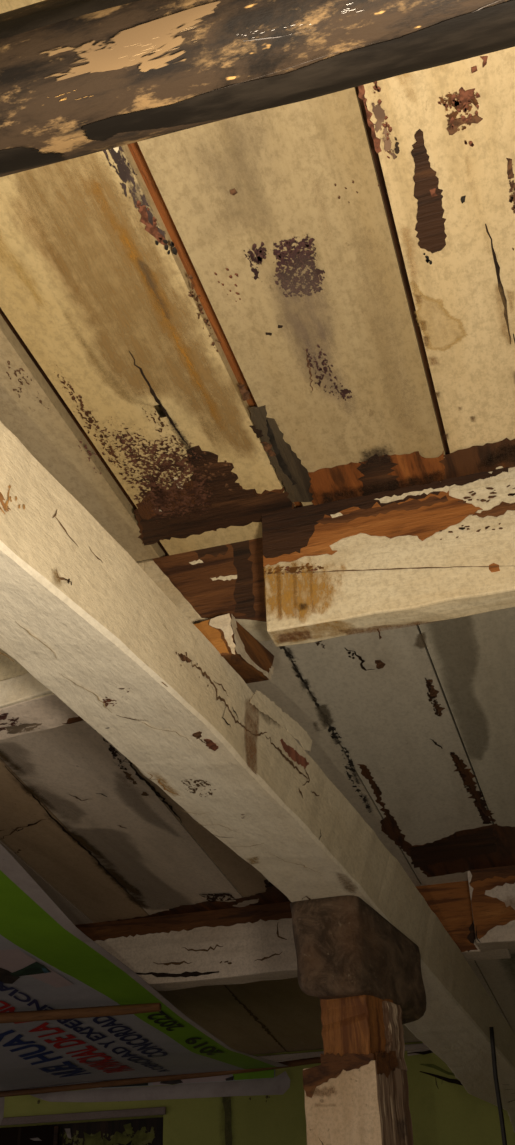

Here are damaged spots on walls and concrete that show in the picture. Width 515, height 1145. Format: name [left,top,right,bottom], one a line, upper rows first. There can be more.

peeling [0,0,139,39]
peeling [41,1,220,101]
peeling [0,146,68,174]
peeling [81,0,515,265]
damp [19,146,253,452]
peeling [188,275,221,352]
peeling [214,234,325,302]
peeling [54,372,515,680]
peeling [192,731,218,751]
peeling [249,690,320,797]
peeling [425,679,445,717]
peeling [357,739,515,952]